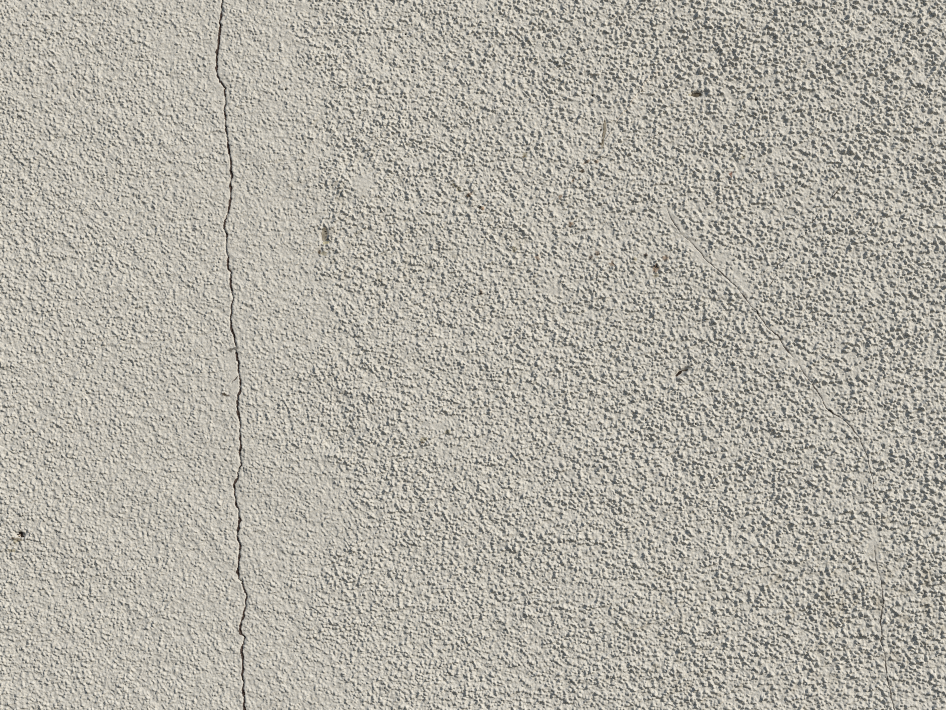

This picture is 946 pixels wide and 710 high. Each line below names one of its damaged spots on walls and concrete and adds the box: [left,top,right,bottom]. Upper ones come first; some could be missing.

crack [215,0,247,710]